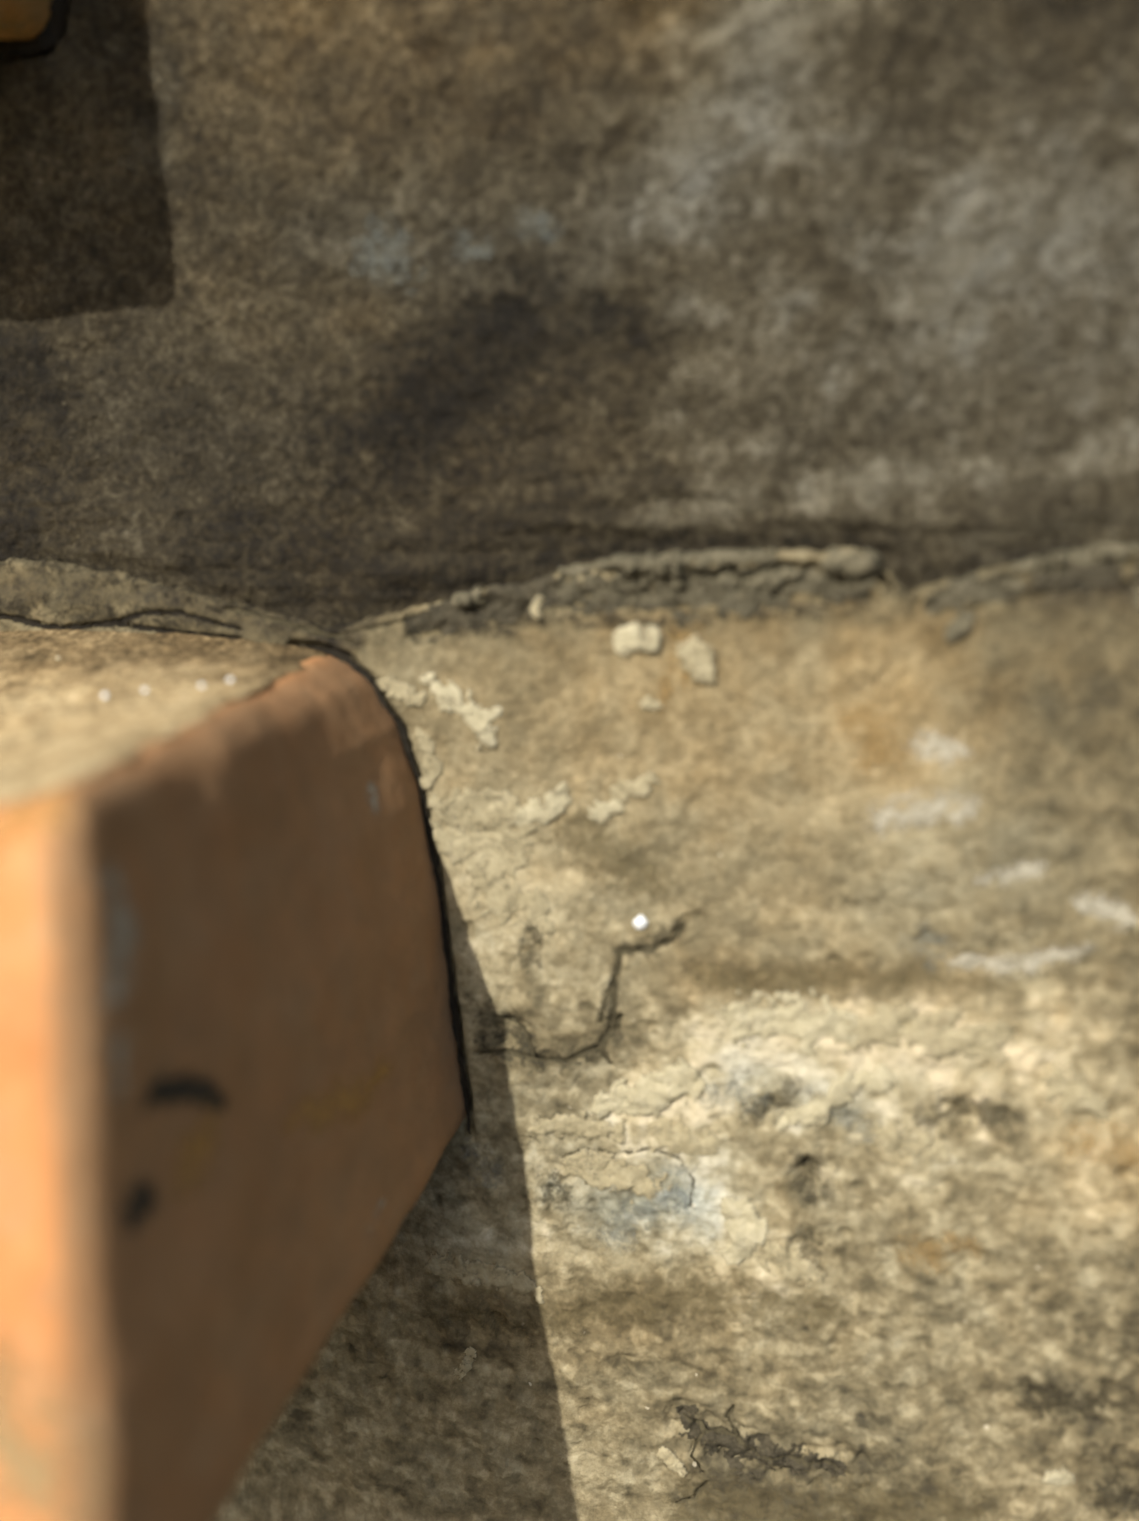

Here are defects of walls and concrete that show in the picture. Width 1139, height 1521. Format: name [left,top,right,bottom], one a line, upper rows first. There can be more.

crack [0,608,687,1135]
crack [675,1405,841,1504]